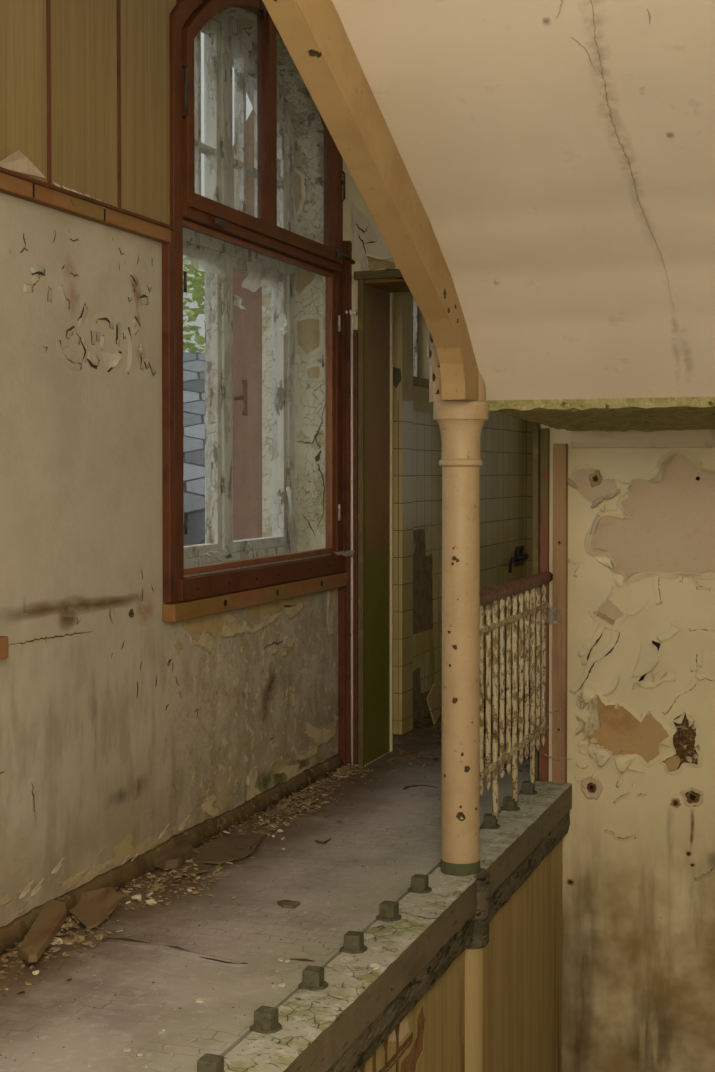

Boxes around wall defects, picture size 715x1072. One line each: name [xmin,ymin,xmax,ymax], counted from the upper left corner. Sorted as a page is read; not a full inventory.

crack [556,0,674,310]
peeling [23,265,156,376]
peeling [568,464,621,512]
leakage [26,599,130,624]
crack [8,608,202,715]
spalling [246,766,263,801]
spalling [272,719,335,781]
peeling [413,529,433,635]
peeling [573,621,704,800]
spalling [670,786,704,808]